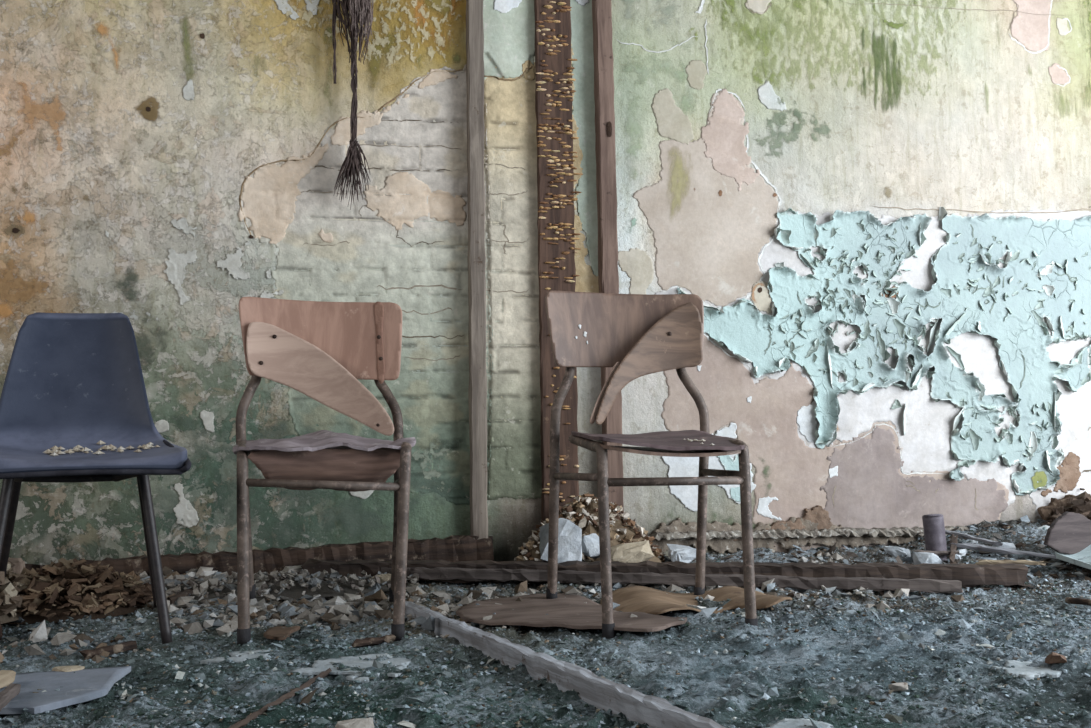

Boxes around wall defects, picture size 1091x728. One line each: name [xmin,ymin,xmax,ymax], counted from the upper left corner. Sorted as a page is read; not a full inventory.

damp [183,20,193,80]
peeling [1008,0,1072,54]
damp [137,97,160,121]
peeling [570,0,599,293]
damp [112,269,165,375]
peeling [163,248,197,305]
spalling [216,65,470,505]
spalling [483,0,542,503]
peeling [618,60,1091,554]
peeling [155,420,169,433]
peeling [200,410,215,432]
peeling [173,483,199,528]